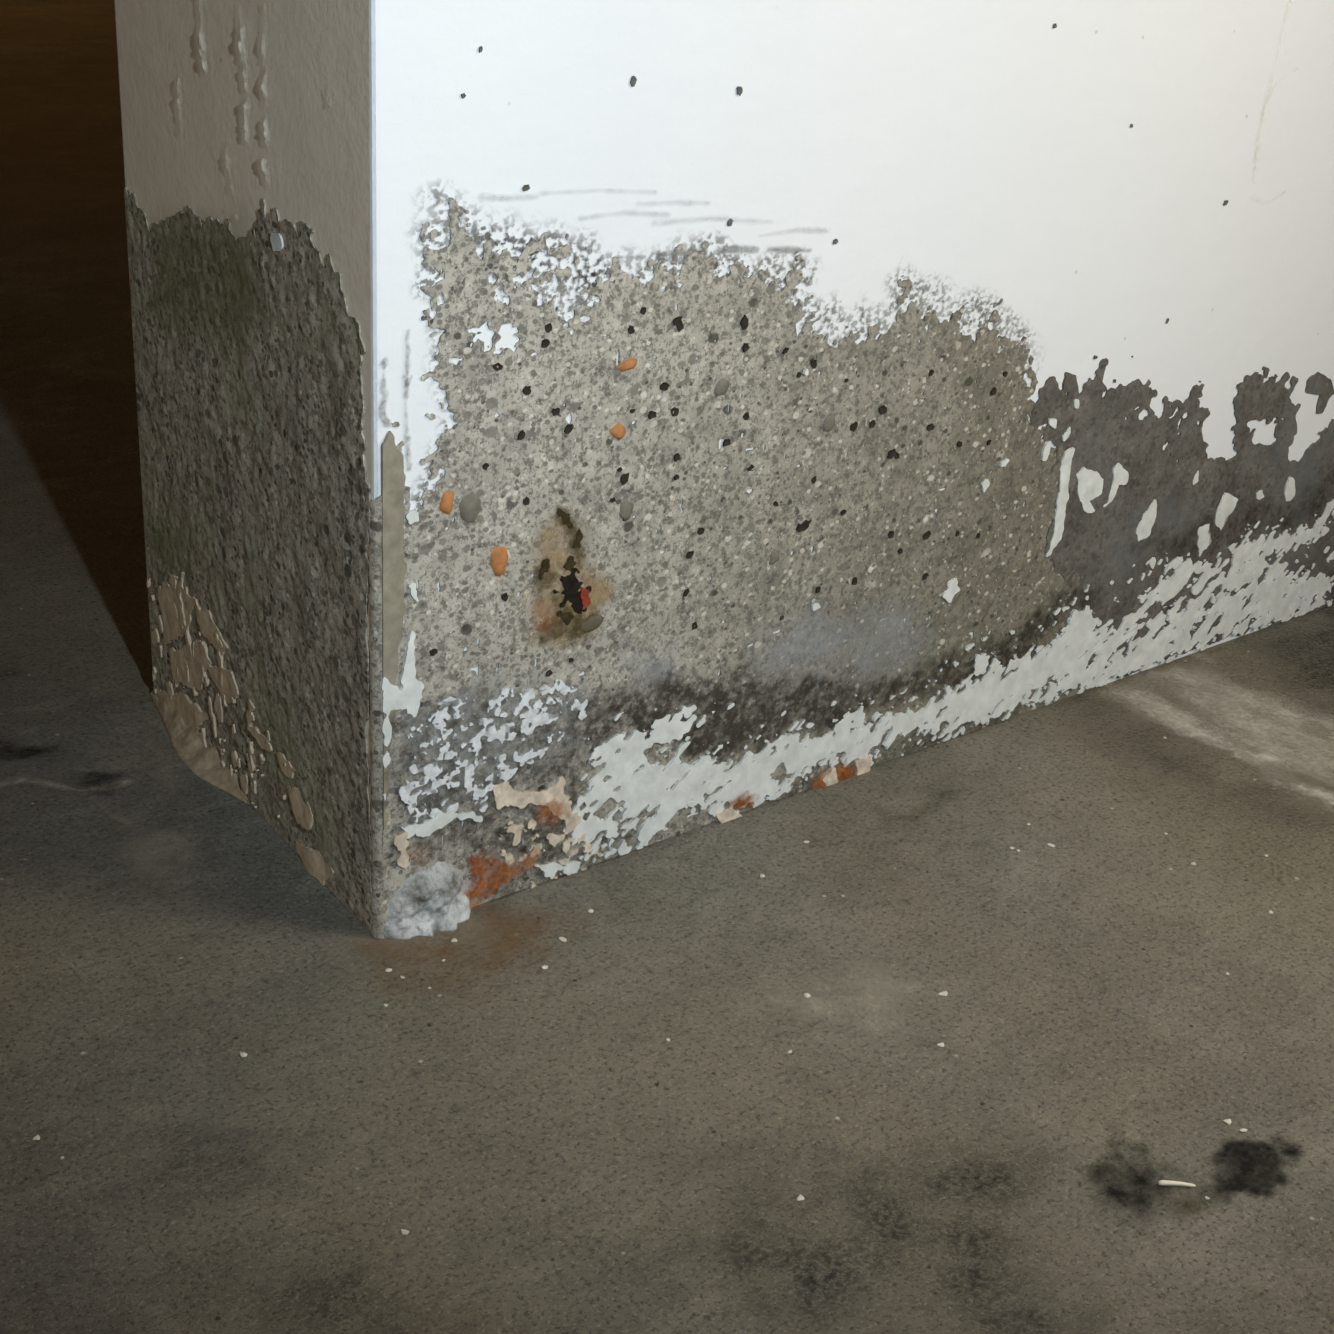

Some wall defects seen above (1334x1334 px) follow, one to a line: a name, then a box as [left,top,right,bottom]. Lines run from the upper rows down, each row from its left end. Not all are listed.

rust [466,855,537,897]
spalling [124,187,1334,939]